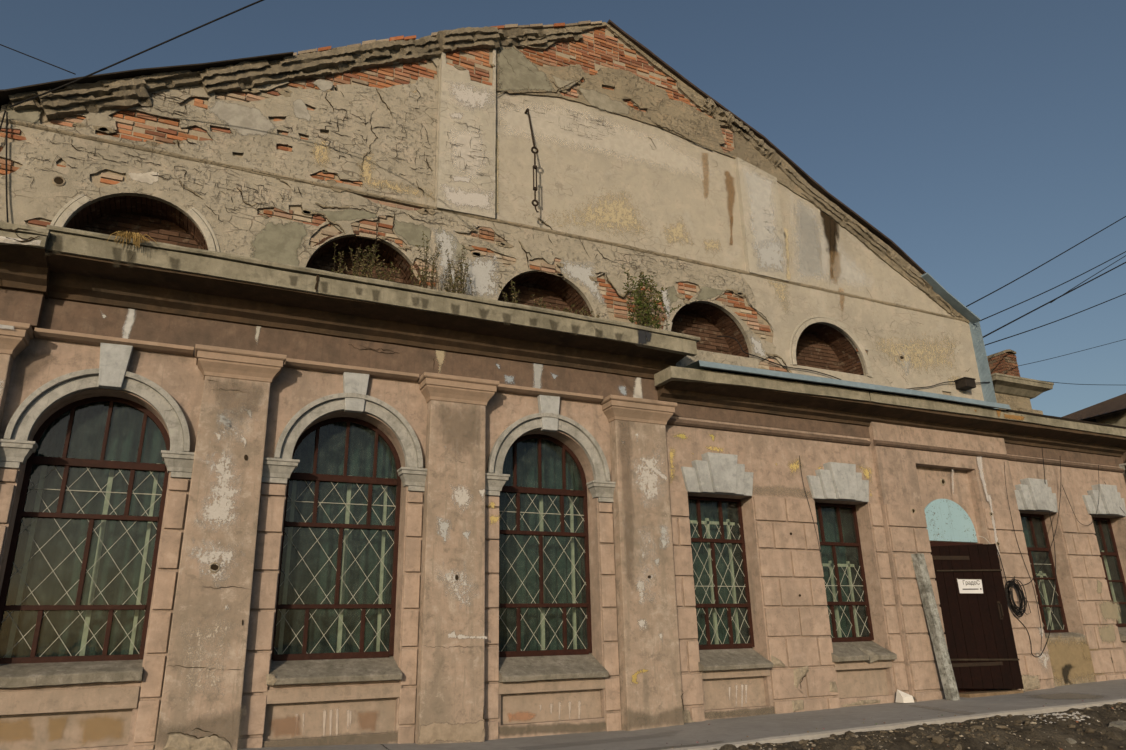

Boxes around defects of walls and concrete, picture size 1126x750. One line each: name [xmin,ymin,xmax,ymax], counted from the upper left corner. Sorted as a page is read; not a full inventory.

spalling [180,49,495,119]
spalling [517,27,734,153]
spalling [0,128,27,176]
spalling [90,170,126,188]
spalling [39,110,231,146]
spalling [257,118,700,330]
damp [821,211,839,278]
spalling [715,290,787,372]
peeling [191,408,252,587]
peeling [634,434,686,506]